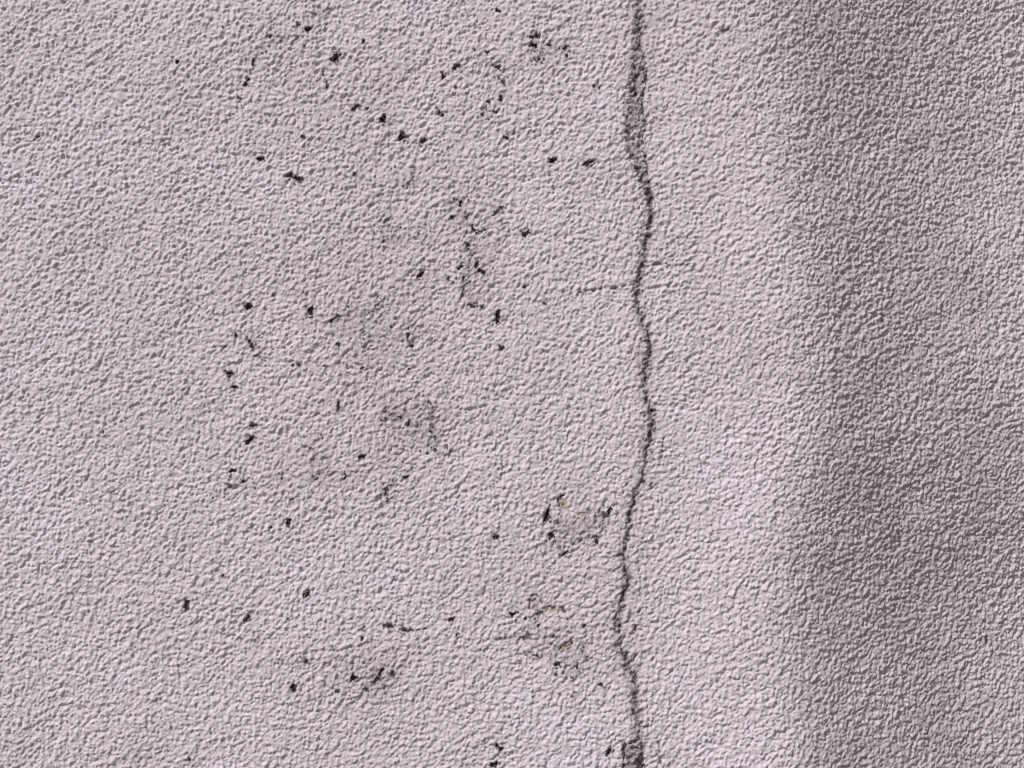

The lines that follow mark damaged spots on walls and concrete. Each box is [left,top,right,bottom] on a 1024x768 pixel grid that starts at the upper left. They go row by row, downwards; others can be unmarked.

crack [634,49,650,199]